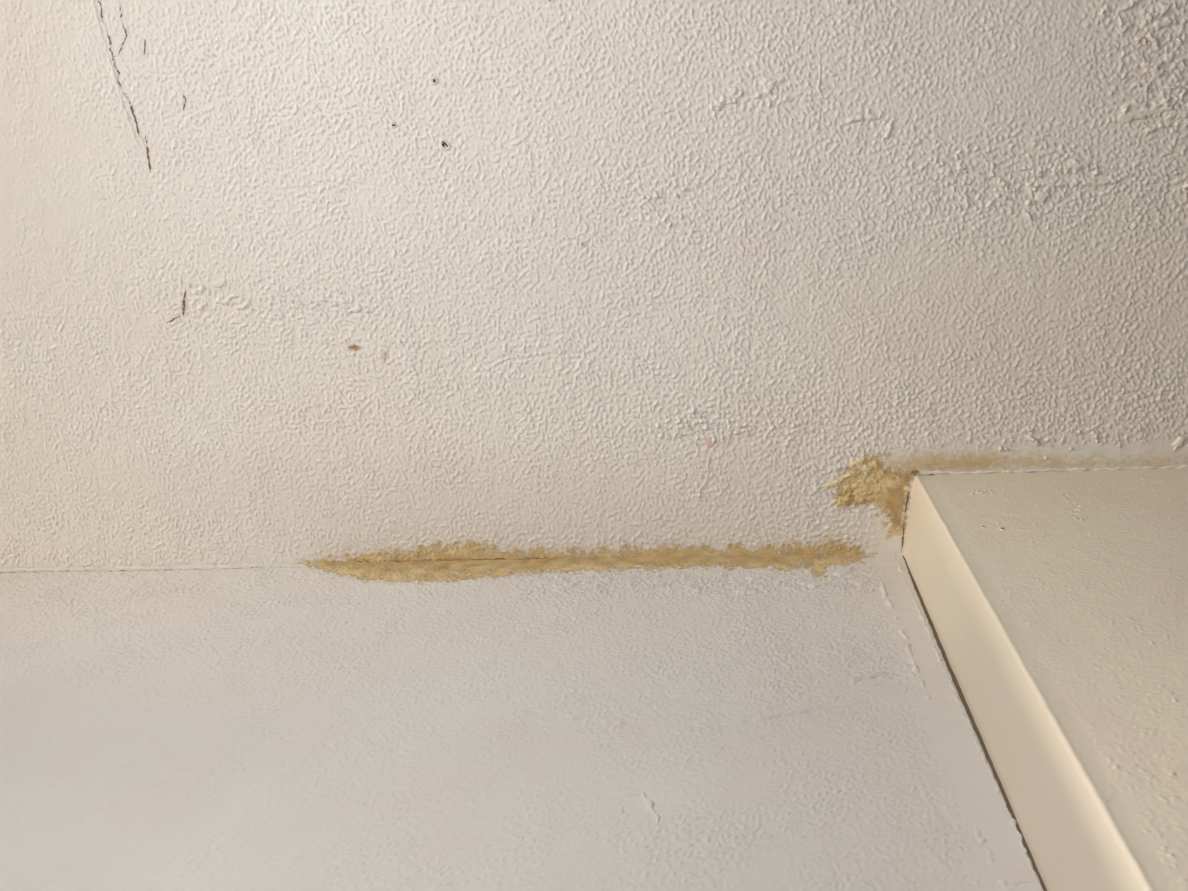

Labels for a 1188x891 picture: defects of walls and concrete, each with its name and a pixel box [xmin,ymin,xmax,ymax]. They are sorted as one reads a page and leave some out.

crack [91,0,151,172]
water stain [811,455,1000,539]
water stain [298,540,877,584]